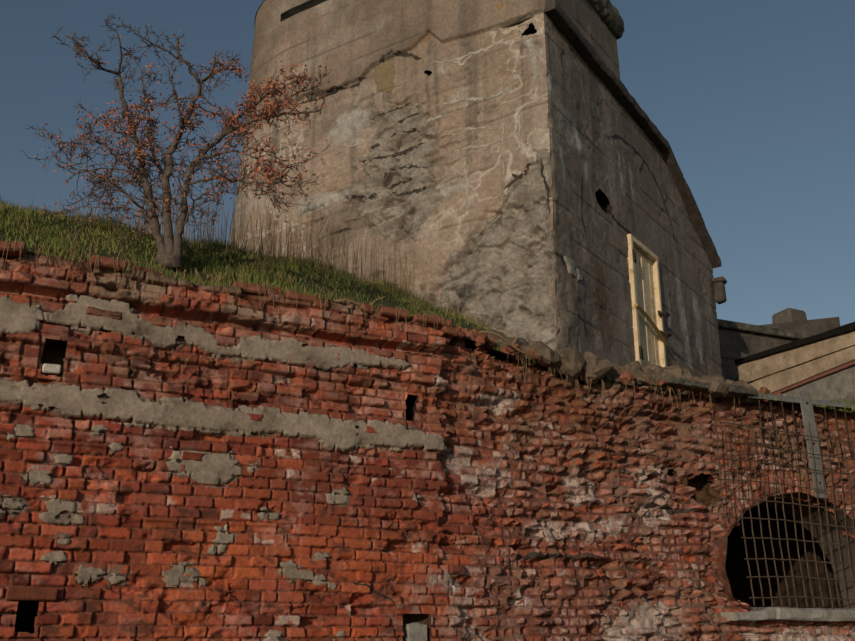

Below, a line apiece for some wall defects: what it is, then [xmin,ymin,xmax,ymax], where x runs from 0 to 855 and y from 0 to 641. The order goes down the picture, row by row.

water stain [330,110,369,143]
crack [317,38,550,214]
water stain [298,190,350,213]
crack [605,134,680,255]
spalling [35,338,68,380]
spalling [665,464,722,505]